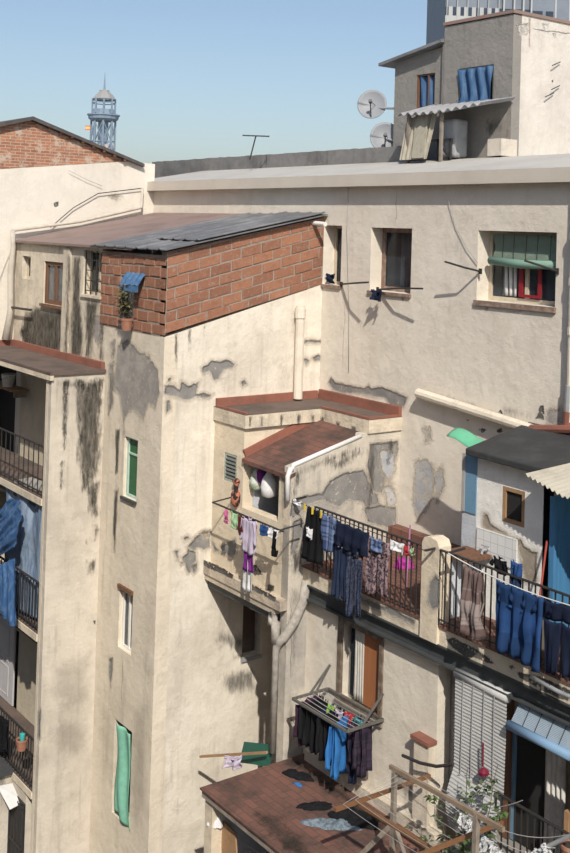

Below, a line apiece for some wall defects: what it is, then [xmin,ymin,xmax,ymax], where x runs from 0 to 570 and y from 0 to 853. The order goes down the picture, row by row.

water stain [21,257,103,358]
peeling [108,340,235,420]
peeling [328,378,408,407]
water stain [62,380,102,514]
peeling [290,440,399,556]
peeling [413,460,444,519]
peeling [174,530,236,579]
spalling [246,565,276,602]
water stain [229,671,252,690]